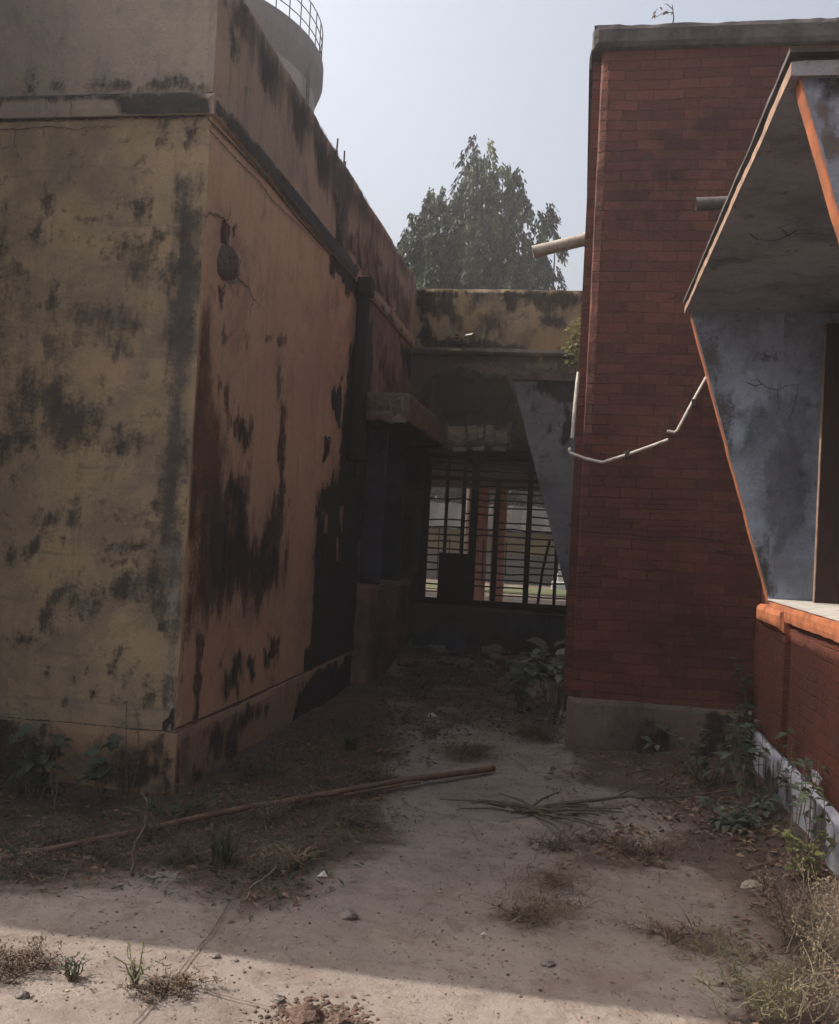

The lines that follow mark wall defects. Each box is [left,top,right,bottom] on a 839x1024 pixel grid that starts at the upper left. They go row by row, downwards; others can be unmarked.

crack [0,98,350,278]
water stain [93,2,388,304]
water stain [374,254,582,379]
water stain [0,179,289,761]
water stain [293,319,373,721]